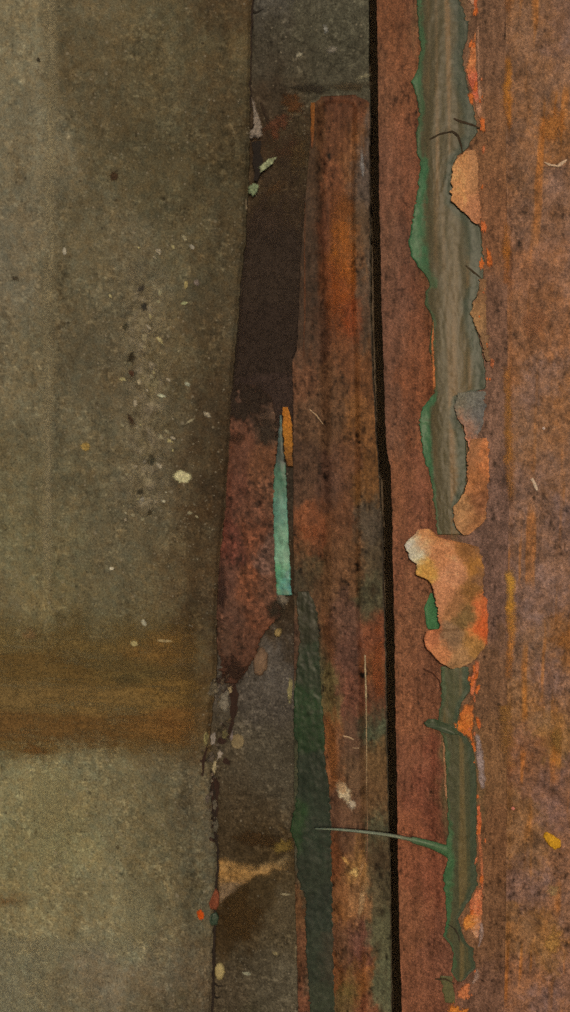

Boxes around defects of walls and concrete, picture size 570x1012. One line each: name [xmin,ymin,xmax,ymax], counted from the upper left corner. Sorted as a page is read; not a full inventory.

rust [266,82,370,165]
rust [282,407,293,466]
peeling [273,0,494,1012]
rust [506,574,515,665]